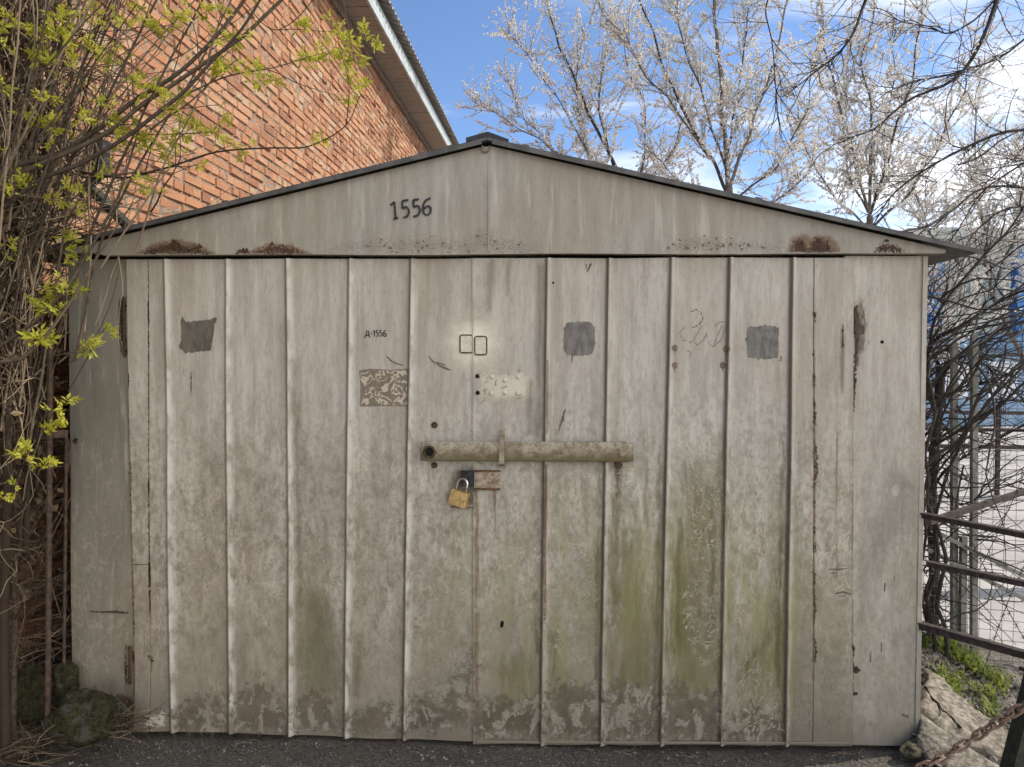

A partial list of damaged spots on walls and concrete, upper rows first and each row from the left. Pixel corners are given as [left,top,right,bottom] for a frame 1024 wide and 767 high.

rust [144,239,209,258]
rust [236,242,307,257]
rust [790,236,839,256]
rust [872,239,902,257]
rust [118,299,128,357]
rust [842,303,867,412]
rust [117,645,135,724]
peeling [141,689,355,733]
peeling [368,652,786,742]